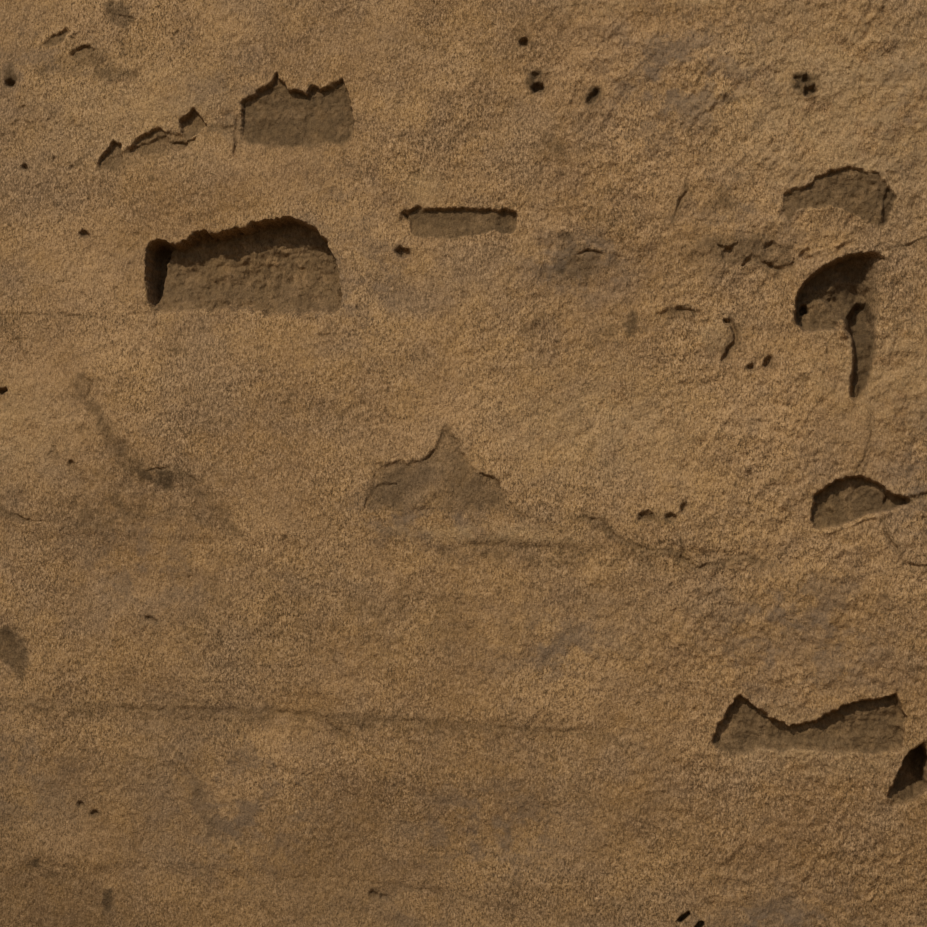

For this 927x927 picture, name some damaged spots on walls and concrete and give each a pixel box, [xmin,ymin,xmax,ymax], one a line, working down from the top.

spalling [51,71,357,178]
spalling [144,215,346,324]
spalling [394,203,522,260]
spalling [691,164,897,337]
spalling [361,423,533,523]
crack [454,511,796,574]
spalling [809,474,893,533]
spalling [708,691,927,817]